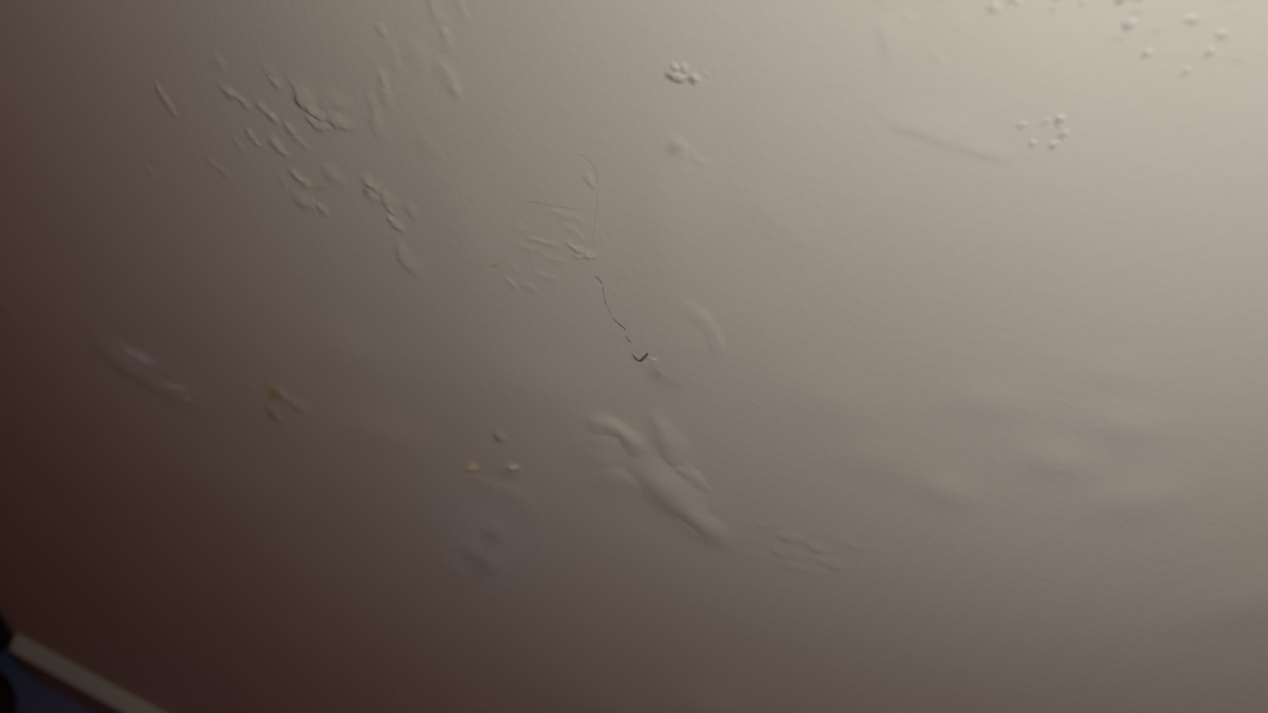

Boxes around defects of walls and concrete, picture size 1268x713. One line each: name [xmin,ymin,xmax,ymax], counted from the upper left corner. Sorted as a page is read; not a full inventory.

crack [630,354,649,368]